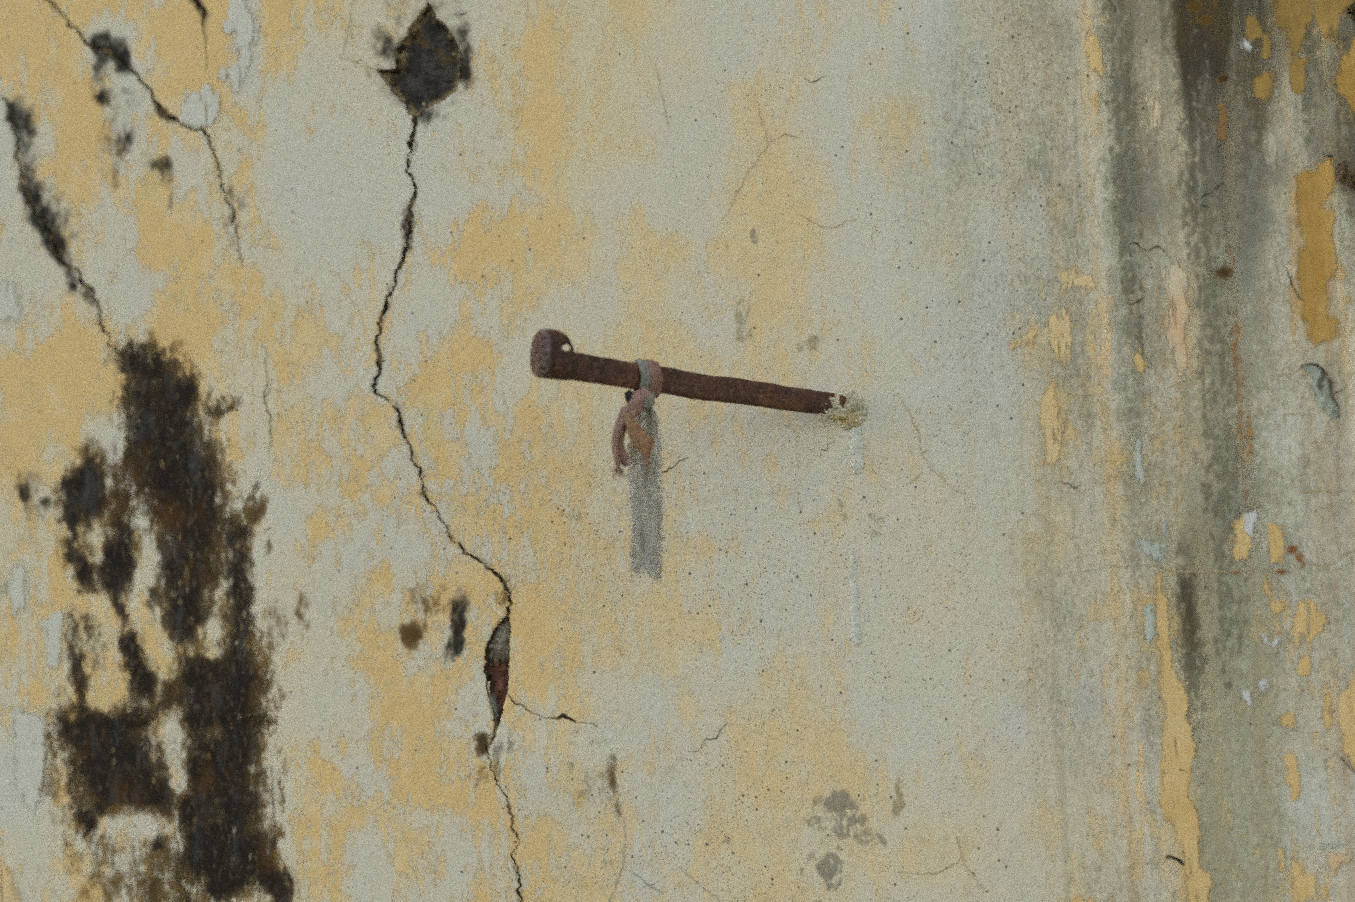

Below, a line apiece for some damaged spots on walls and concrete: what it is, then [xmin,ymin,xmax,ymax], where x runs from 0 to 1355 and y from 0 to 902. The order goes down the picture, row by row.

crack [0,97,124,359]
crack [47,0,243,264]
spalling [374,1,471,123]
crack [370,116,512,620]
leakage [1102,0,1144,373]
leakage [1159,0,1275,731]
peeling [1240,0,1355,112]
peeling [1294,157,1340,349]
leakage [1296,1,1355,147]
leakage [16,334,309,902]
spalling [484,616,511,733]
crack [472,694,597,902]